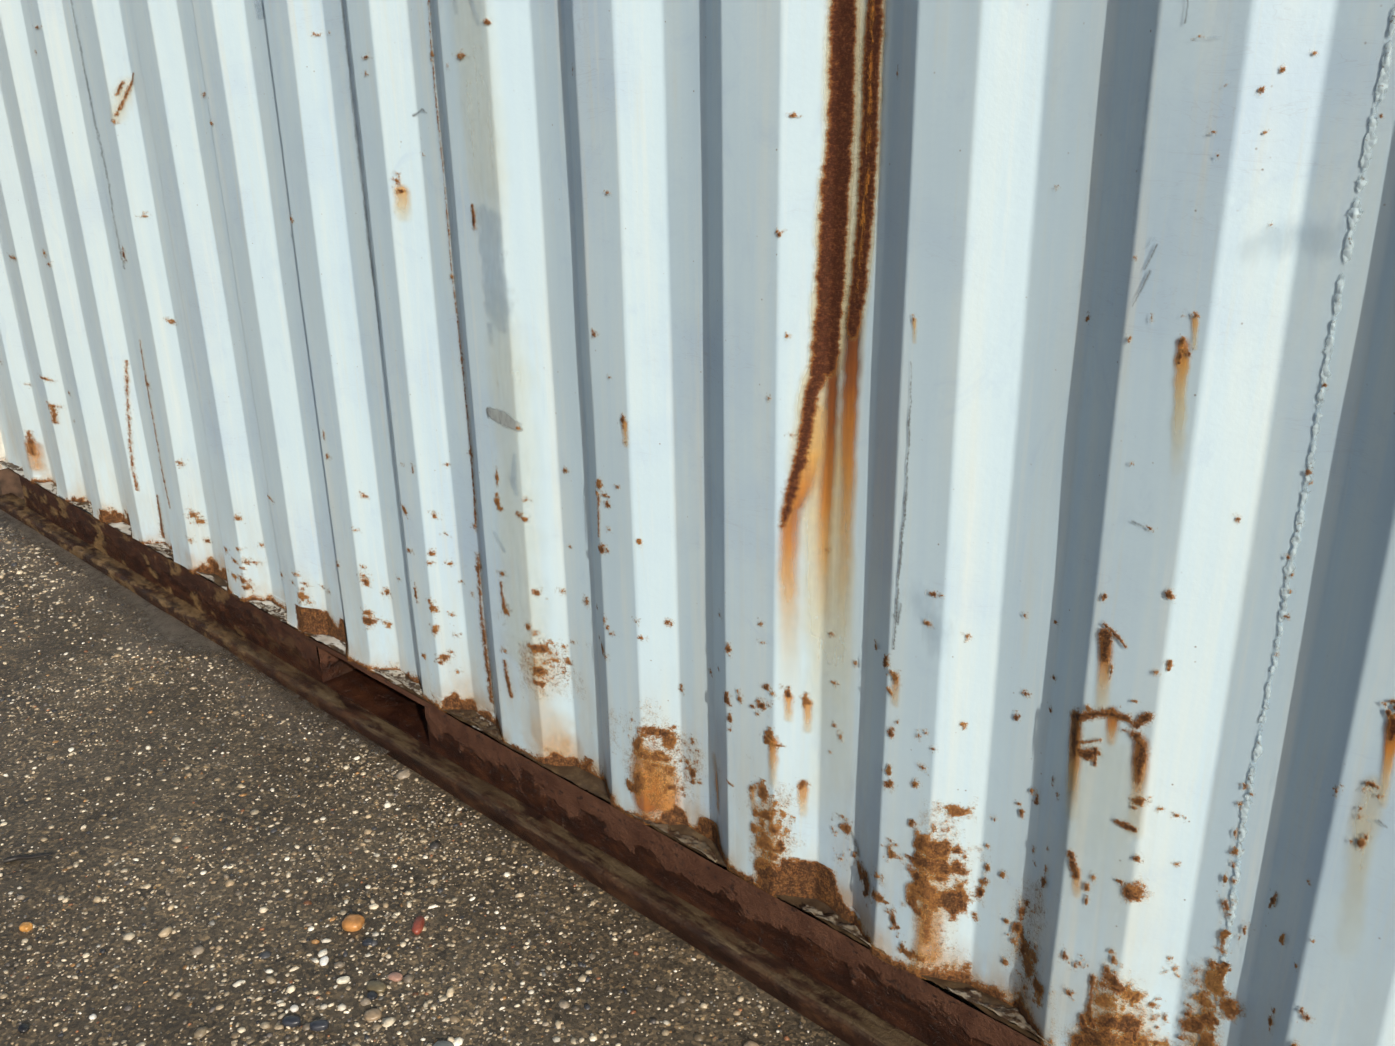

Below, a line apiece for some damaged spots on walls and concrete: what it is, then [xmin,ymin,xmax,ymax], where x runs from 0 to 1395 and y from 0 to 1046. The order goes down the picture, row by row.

rust [780,0,885,607]
rust [1175,312,1200,414]
rust [25,430,1247,1046]
rust [1363,700,1395,799]
rust [1350,807,1368,849]